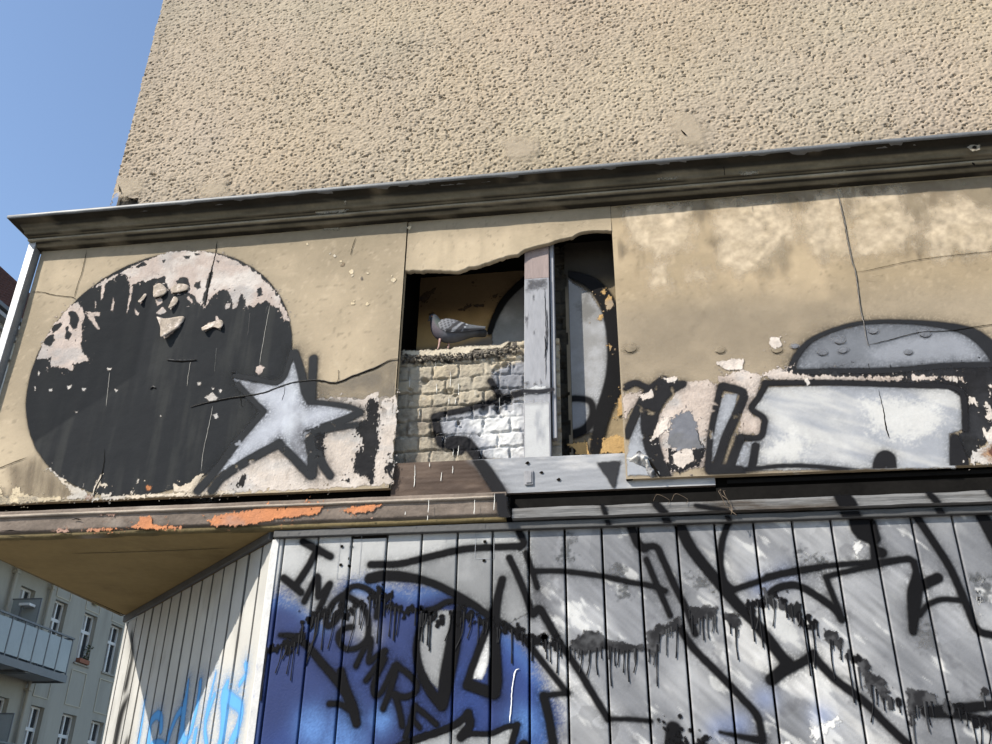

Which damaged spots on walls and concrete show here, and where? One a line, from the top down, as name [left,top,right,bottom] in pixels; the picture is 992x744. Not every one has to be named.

peeling [37,248,290,375]
peeling [0,389,400,534]
crack [190,358,400,408]
spalling [592,289,614,321]
spalling [769,336,785,349]
peeling [567,357,992,477]
crack [838,195,992,346]